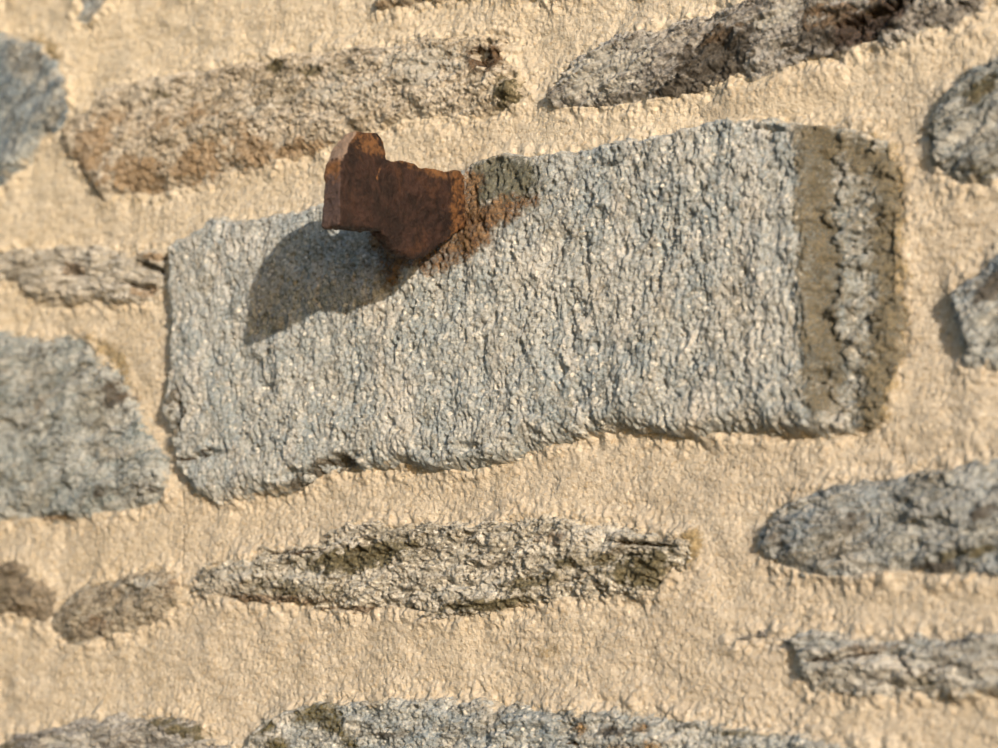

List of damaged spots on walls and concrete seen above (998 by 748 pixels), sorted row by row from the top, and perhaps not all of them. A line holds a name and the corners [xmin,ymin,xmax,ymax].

rust [368,171,540,286]